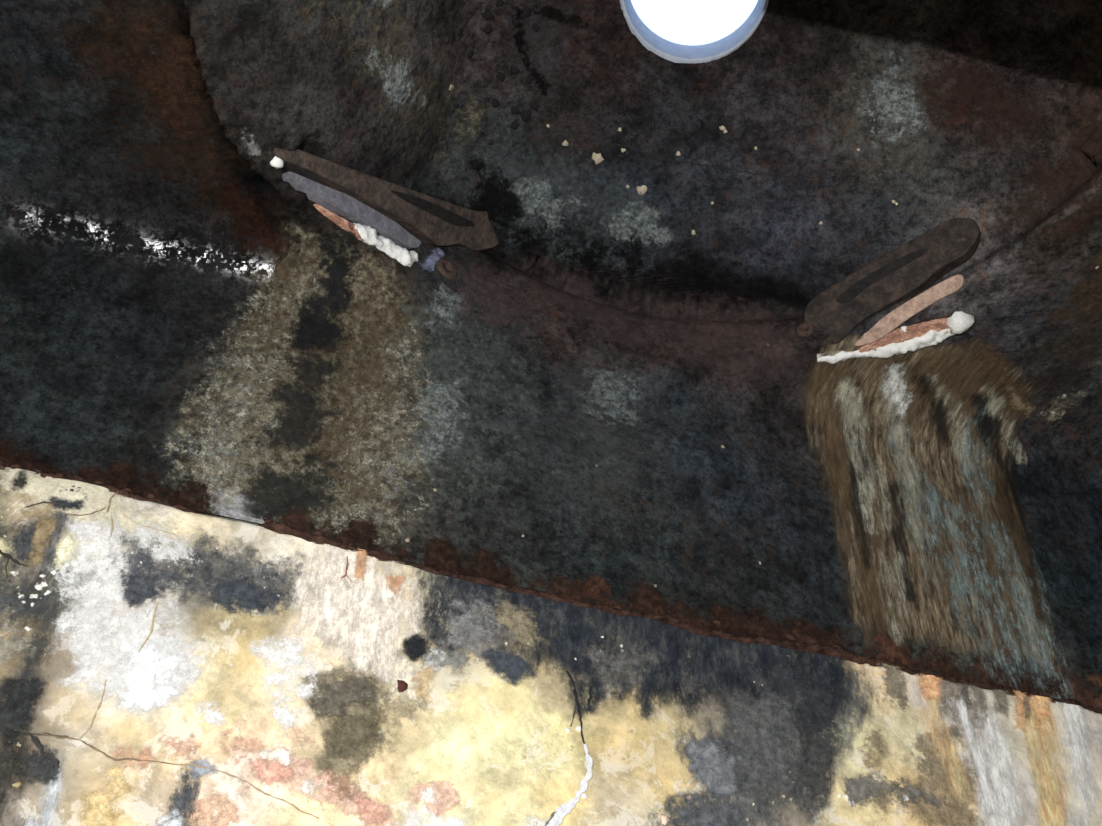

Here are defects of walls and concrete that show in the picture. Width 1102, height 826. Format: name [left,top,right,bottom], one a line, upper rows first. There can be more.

damp [164,224,539,545]
crack [0,550,28,577]
corrosion [0,442,220,515]
crack [67,491,176,537]
crack [138,602,175,652]
damp [0,335,1096,826]
crack [0,680,319,818]
crack [545,671,594,826]